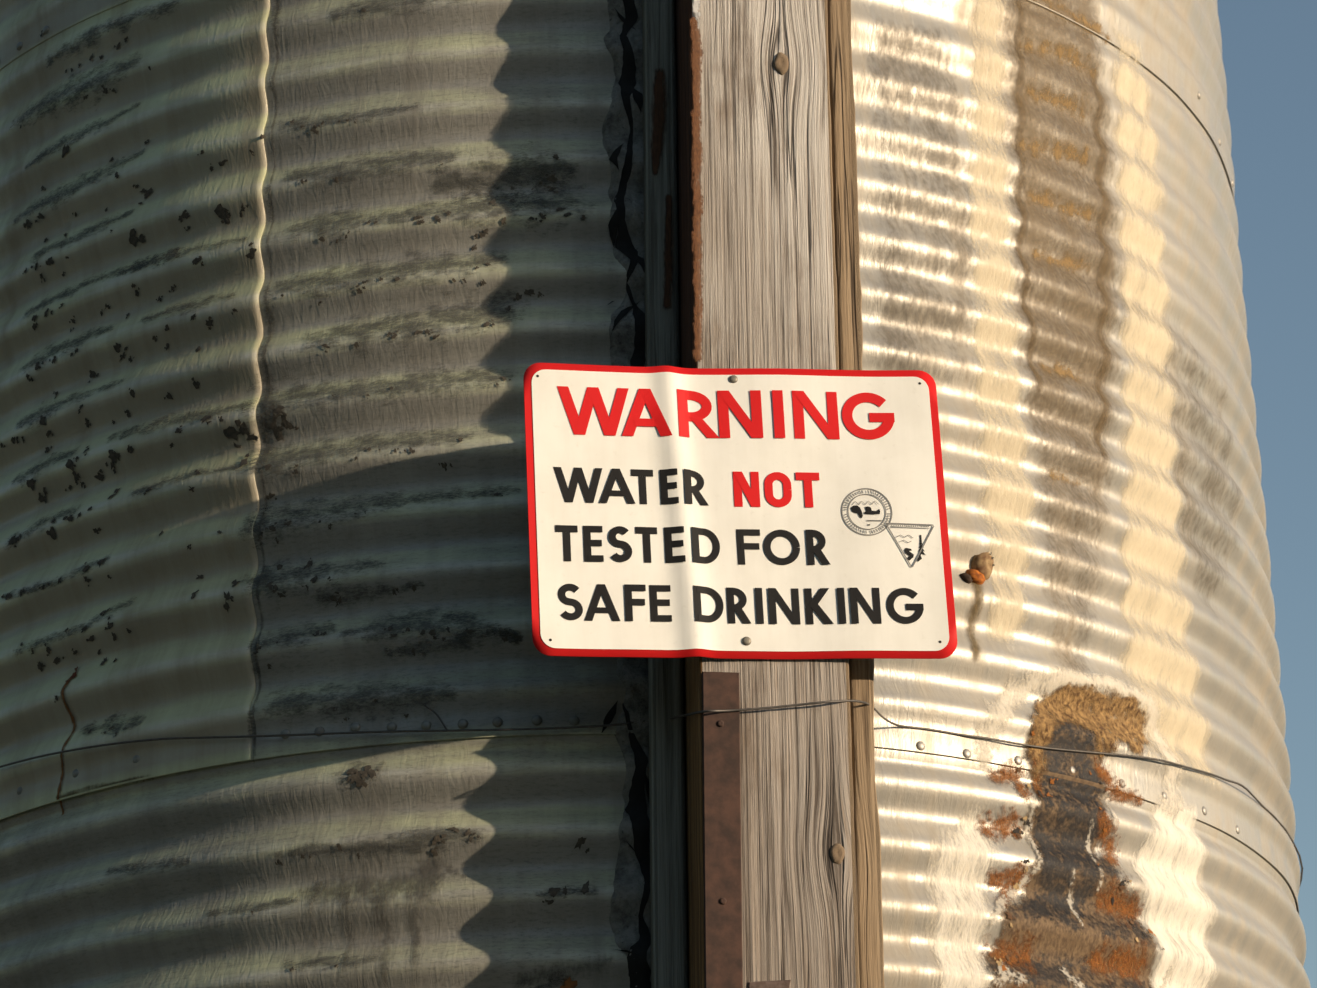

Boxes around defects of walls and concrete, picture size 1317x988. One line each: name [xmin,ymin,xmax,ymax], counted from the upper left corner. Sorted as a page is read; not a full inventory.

rust [54,666,142,815]
rust [976,682,1165,988]